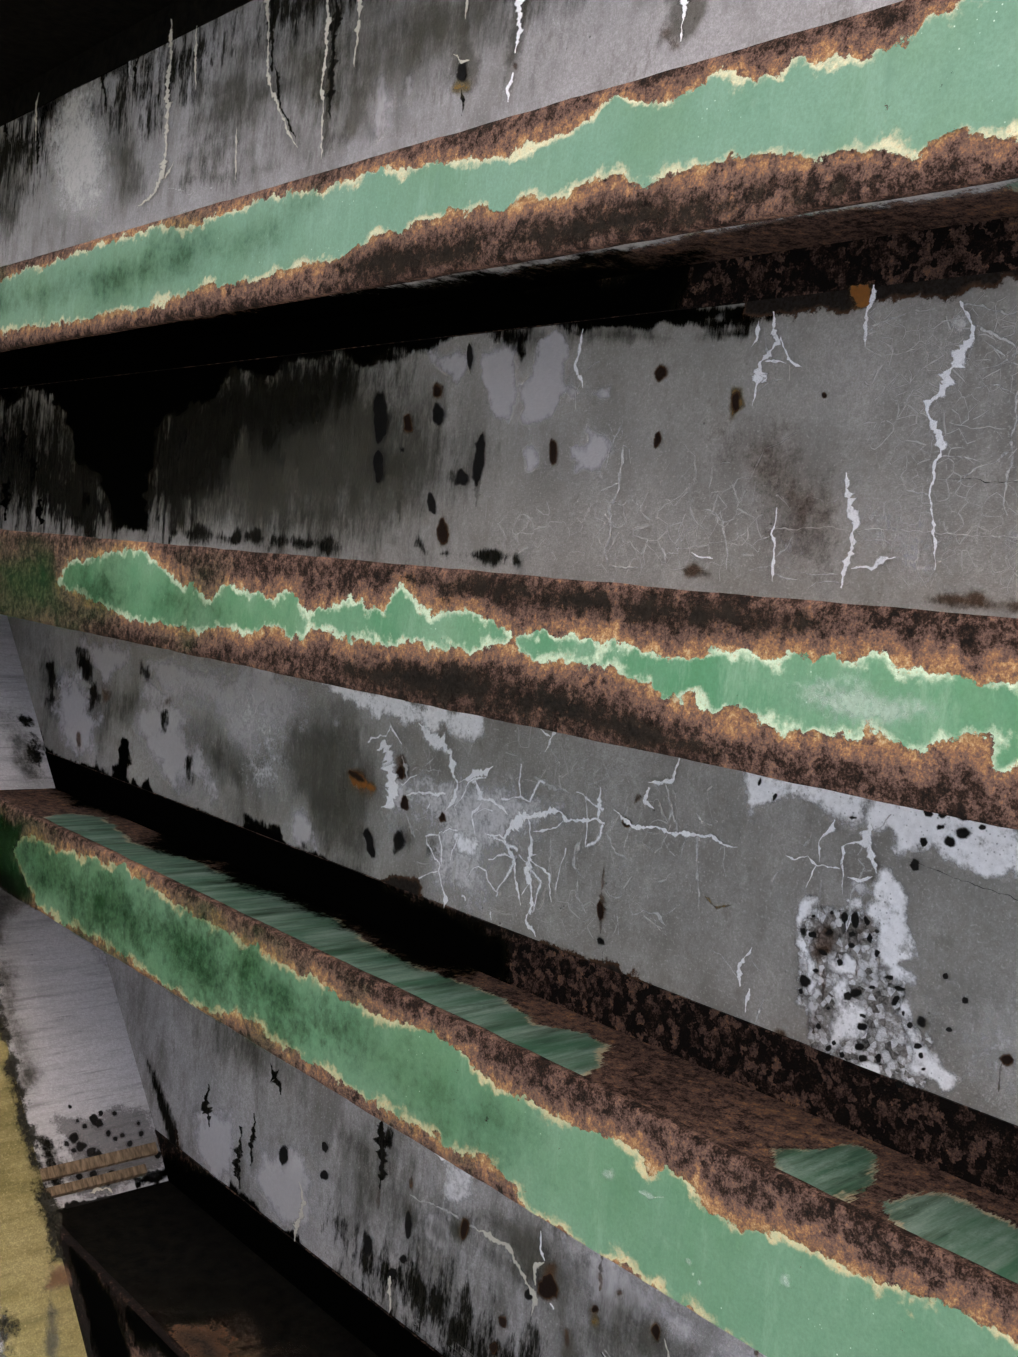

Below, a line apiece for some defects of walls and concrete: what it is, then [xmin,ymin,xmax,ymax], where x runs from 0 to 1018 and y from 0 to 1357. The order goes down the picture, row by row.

crack [263,0,365,157]
water stain [0,175,851,557]
peeling [0,0,1018,337]
crack [485,285,1018,600]
rust [742,270,1018,319]
water stain [0,646,723,994]
rust [396,755,409,811]
peeling [52,547,1018,773]
crack [368,723,736,942]
rust [931,591,1018,612]
water stain [147,1060,541,1357]
peeling [13,811,1018,1357]